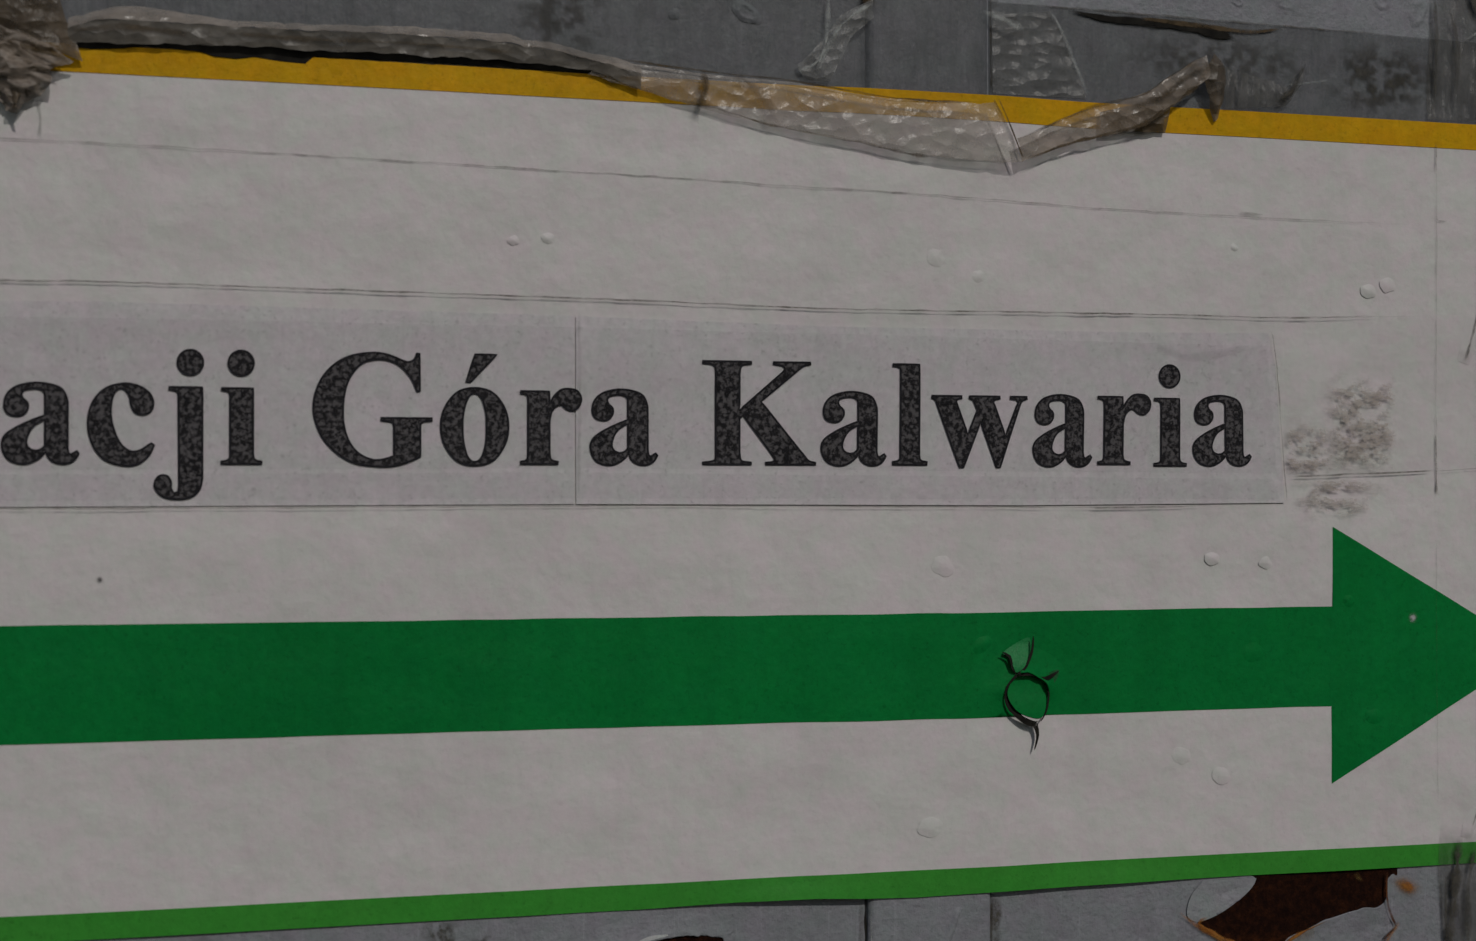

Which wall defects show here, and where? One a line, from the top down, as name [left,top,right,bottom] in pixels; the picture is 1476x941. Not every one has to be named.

corrosion [581,912,763,941]
corrosion [1180,866,1415,941]